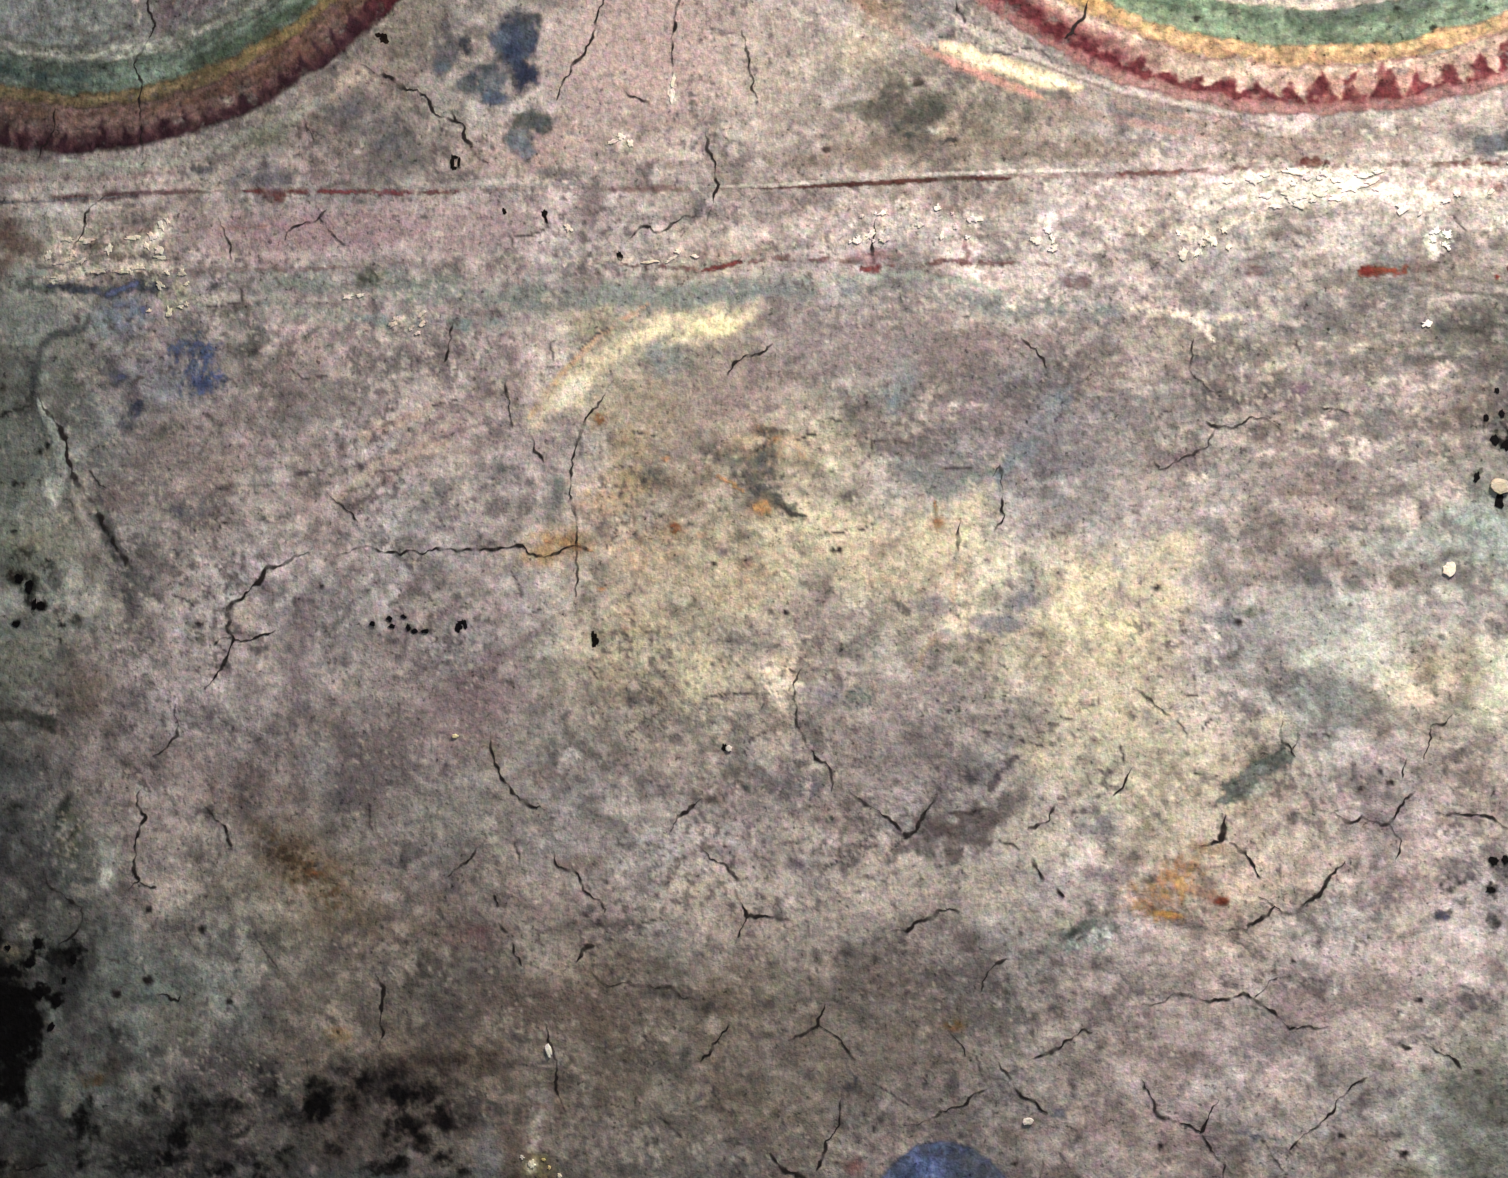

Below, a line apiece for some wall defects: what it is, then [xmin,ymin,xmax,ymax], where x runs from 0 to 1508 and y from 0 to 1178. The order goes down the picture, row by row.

crack [557,0,604,100]
water stain [1483,387,1508,451]
crack [42,405,129,566]
crack [329,383,605,597]
water stain [1494,494,1504,508]
crack [204,552,309,689]
crack [789,668,934,838]
crack [1210,816,1345,930]
water stain [1435,855,1508,928]
water stain [0,927,89,1111]
water stain [66,1095,102,1166]
water stain [106,1055,471,1178]